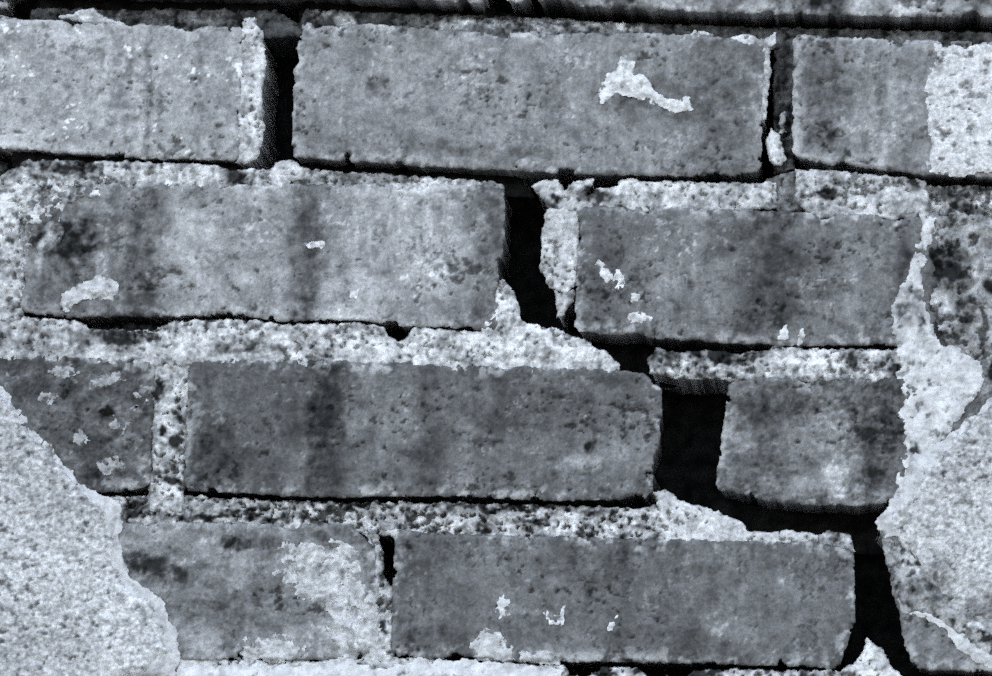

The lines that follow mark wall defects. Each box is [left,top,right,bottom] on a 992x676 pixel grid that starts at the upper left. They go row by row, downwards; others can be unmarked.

crack [13,0,273,20]
crack [299,0,690,26]
crack [719,24,992,33]
crack [275,56,983,676]
spalling [928,211,992,383]
peeling [0,386,564,676]
peeling [875,397,992,669]